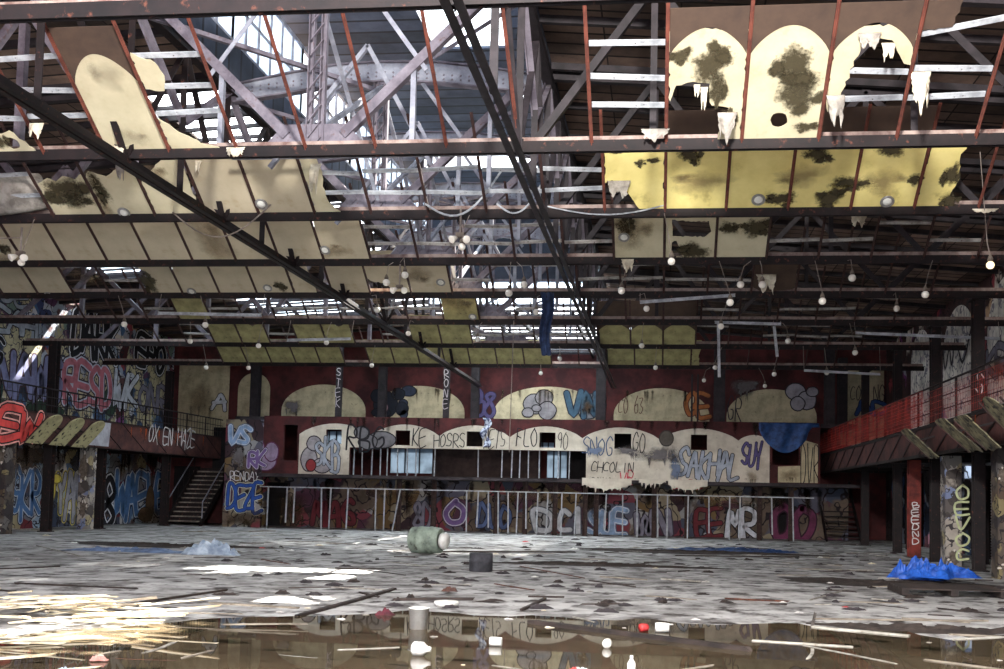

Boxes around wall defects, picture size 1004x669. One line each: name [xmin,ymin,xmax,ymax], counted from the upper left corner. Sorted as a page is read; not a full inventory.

water stain [669,40,738,122]
water stain [768,45,824,133]
water stain [804,150,833,163]
water stain [878,148,903,157]
water stain [43,172,113,208]
water stain [765,191,795,208]
water stain [815,177,871,208]
water stain [939,163,962,207]